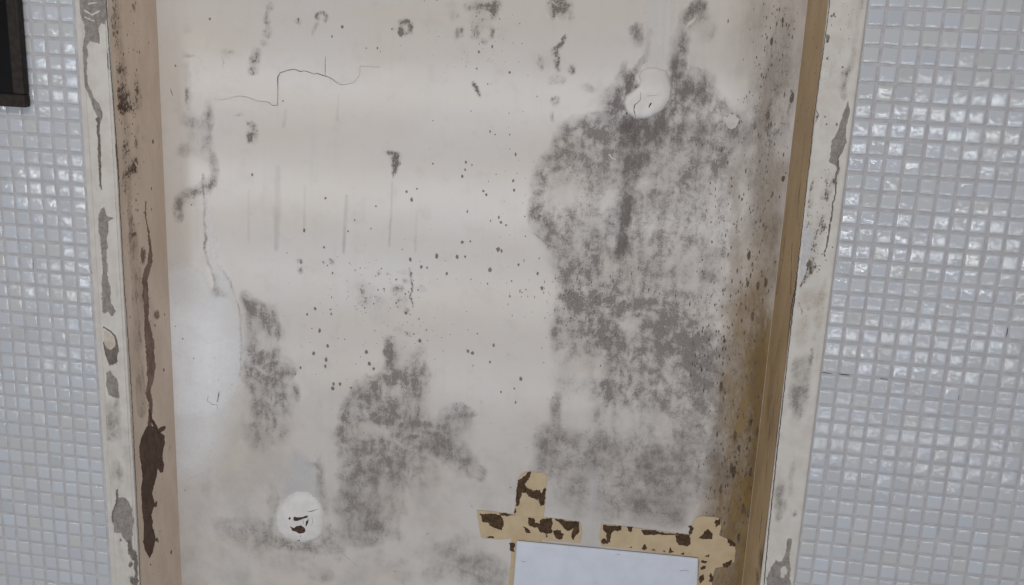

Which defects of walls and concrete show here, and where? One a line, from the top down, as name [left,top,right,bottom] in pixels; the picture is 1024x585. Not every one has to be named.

peeling [79,0,106,190]
crack [223,58,373,106]
peeling [829,102,850,175]
peeling [98,207,116,316]
peeling [103,326,119,398]
peeling [111,201,166,558]
leakage [244,299,279,340]
leakage [247,345,301,424]
leakage [323,239,471,353]
leakage [331,325,470,531]
leakage [506,3,839,585]